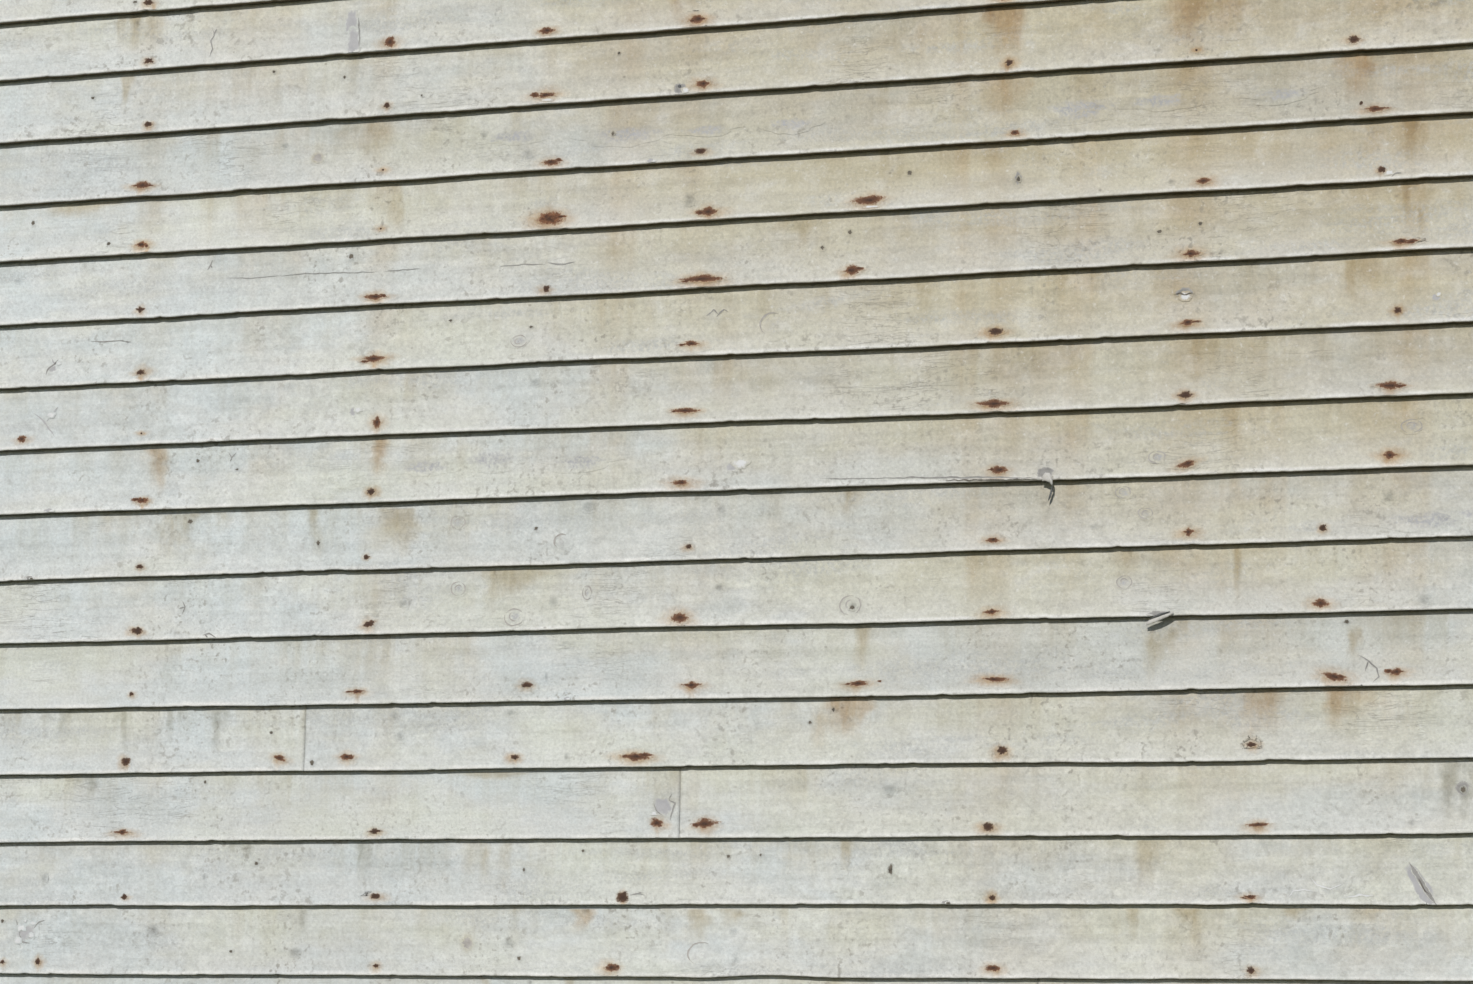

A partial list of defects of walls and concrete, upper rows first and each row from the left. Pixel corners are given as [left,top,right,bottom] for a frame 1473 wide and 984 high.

corrosion [978,0,1039,140]
corrosion [838,188,898,211]
corrosion [515,201,582,231]
corrosion [663,269,738,289]
corrosion [831,261,871,280]
corrosion [346,347,404,369]
corrosion [1364,376,1418,396]
corrosion [961,396,1029,412]
corrosion [653,603,704,626]
corrosion [1233,663,1420,756]
corrosion [599,747,670,766]
corrosion [644,811,728,838]